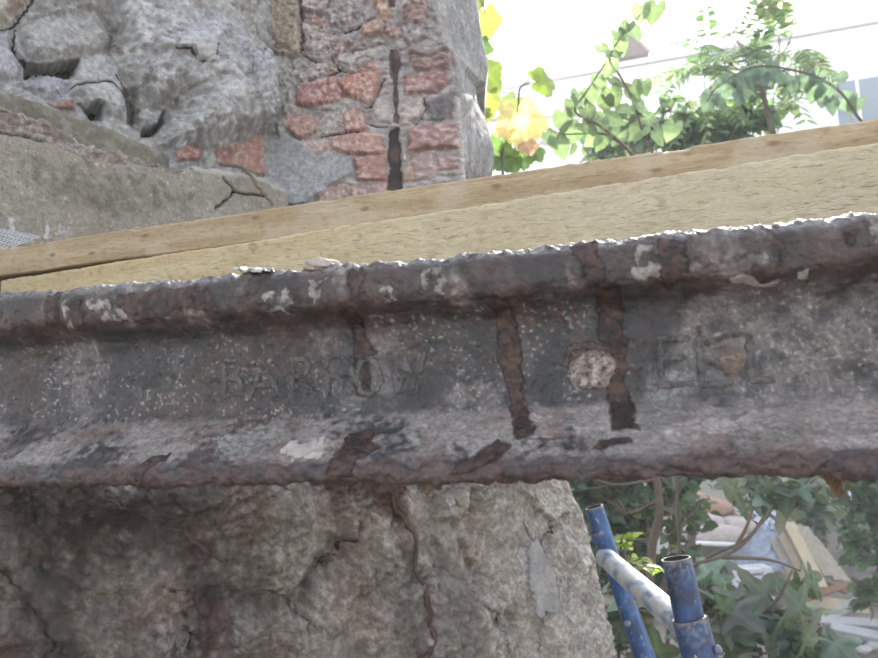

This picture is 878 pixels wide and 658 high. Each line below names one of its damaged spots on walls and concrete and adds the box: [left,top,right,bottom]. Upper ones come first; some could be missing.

crack [0,0,34,73]
crack [70,74,126,102]
crack [214,179,265,210]
rust [657,238,691,290]
rust [44,291,86,329]
rust [117,286,219,324]
rust [339,266,378,396]
rust [562,241,641,450]
rust [697,330,751,377]
rust [452,297,536,474]
rust [130,452,172,486]
rust [322,428,441,520]